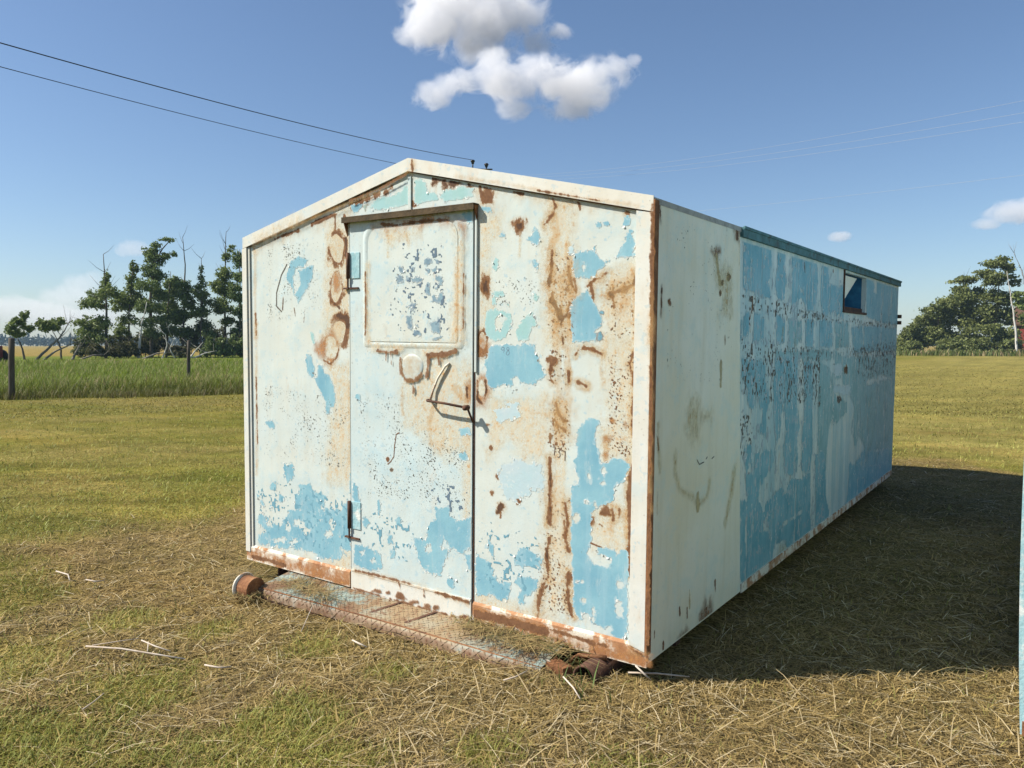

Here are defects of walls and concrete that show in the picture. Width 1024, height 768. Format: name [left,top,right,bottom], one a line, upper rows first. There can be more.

rust [274,159,413,479]
peeling [350,178,492,224]
peeling [257,215,636,639]
rust [250,246,664,666]
rust [537,189,635,456]
rust [649,203,671,346]
peeling [720,242,898,582]